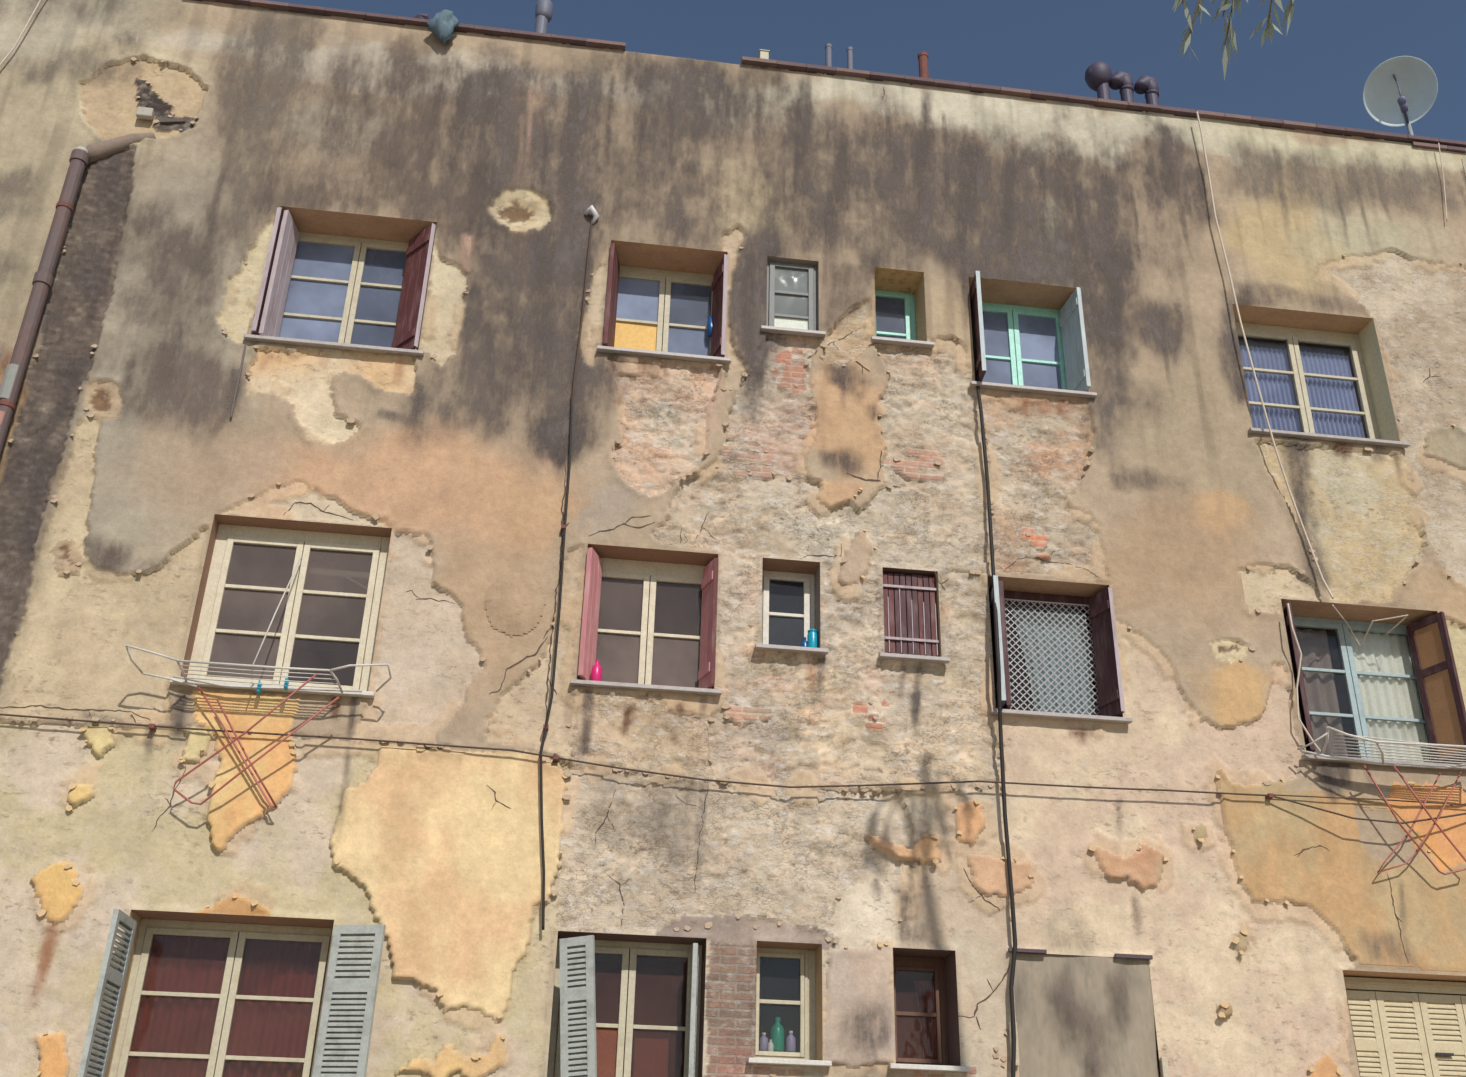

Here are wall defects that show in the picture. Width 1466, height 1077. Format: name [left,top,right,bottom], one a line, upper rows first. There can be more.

flaking render [81,57,208,140]
spalling [489,190,551,232]
damp [321,51,1205,463]
damp [1236,147,1455,215]
damp [125,330,241,426]
flaking render [0,148,212,724]
damp [825,453,856,472]
crack [489,466,717,738]
flaking render [0,218,1466,1077]